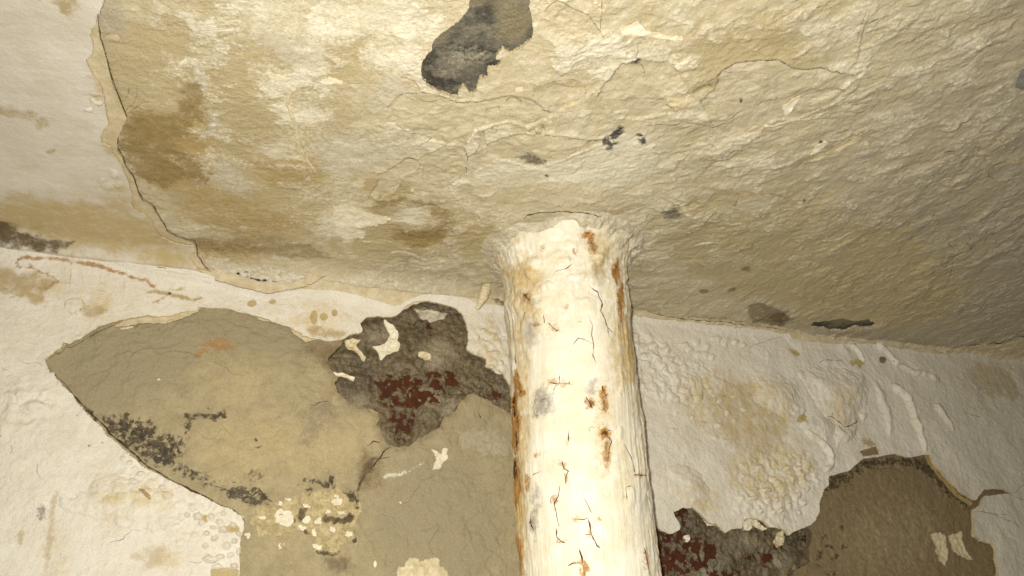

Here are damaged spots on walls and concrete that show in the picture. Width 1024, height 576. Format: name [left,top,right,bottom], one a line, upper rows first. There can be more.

crack [98,8,208,269]
leakage [121,56,220,188]
leakage [0,221,71,253]
rust [17,255,202,302]
peeling [0,0,519,576]
rust [582,230,597,254]
leakage [770,312,793,326]
leakage [85,406,269,506]
rust [511,386,529,490]
rust [585,386,608,412]
rust [600,428,611,462]
peeling [656,447,1009,576]